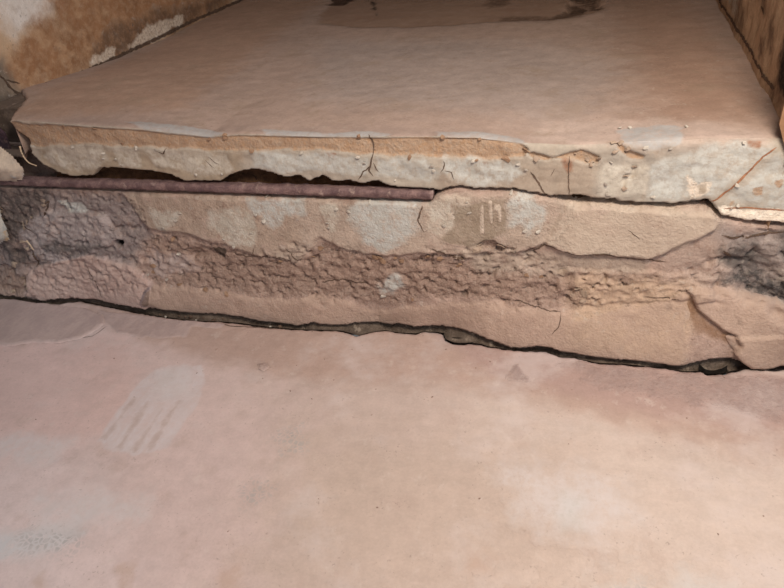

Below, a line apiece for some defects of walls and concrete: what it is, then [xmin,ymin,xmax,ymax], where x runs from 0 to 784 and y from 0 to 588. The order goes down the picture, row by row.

damp [1,0,243,92]
crack [57,135,396,187]
spalling [11,121,784,311]
crack [417,163,465,261]
crack [702,147,783,211]
damp [713,200,784,300]
crack [722,231,783,257]
damp [751,186,764,197]
crack [0,269,784,378]